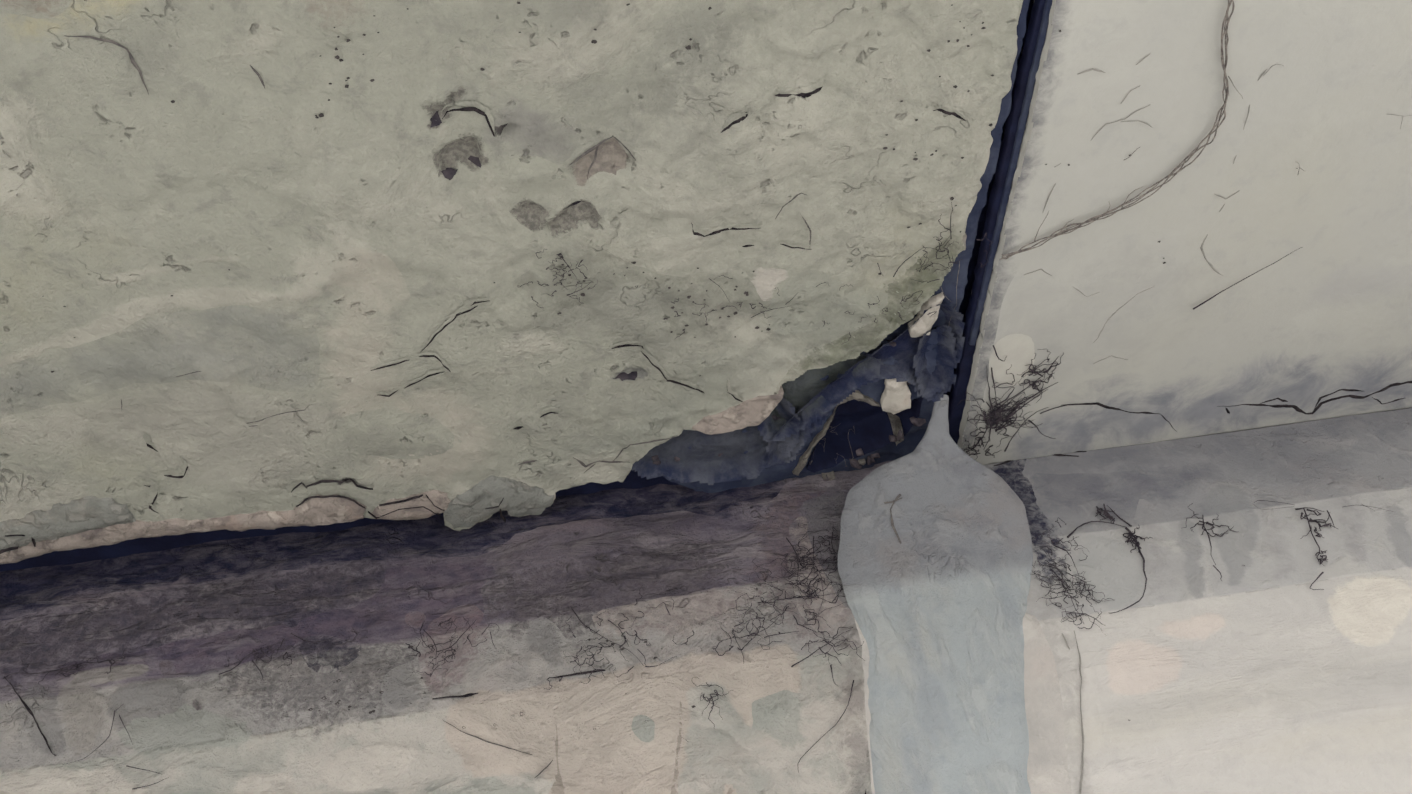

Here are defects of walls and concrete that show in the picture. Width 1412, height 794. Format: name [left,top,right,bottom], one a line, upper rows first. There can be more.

crack [1077,54,1151,140]
peeling [0,0,1020,564]
leakage [967,219,1412,610]
crack [1225,381,1412,414]
leakage [0,478,789,764]
peeling [0,585,813,794]
peeling [787,516,854,641]